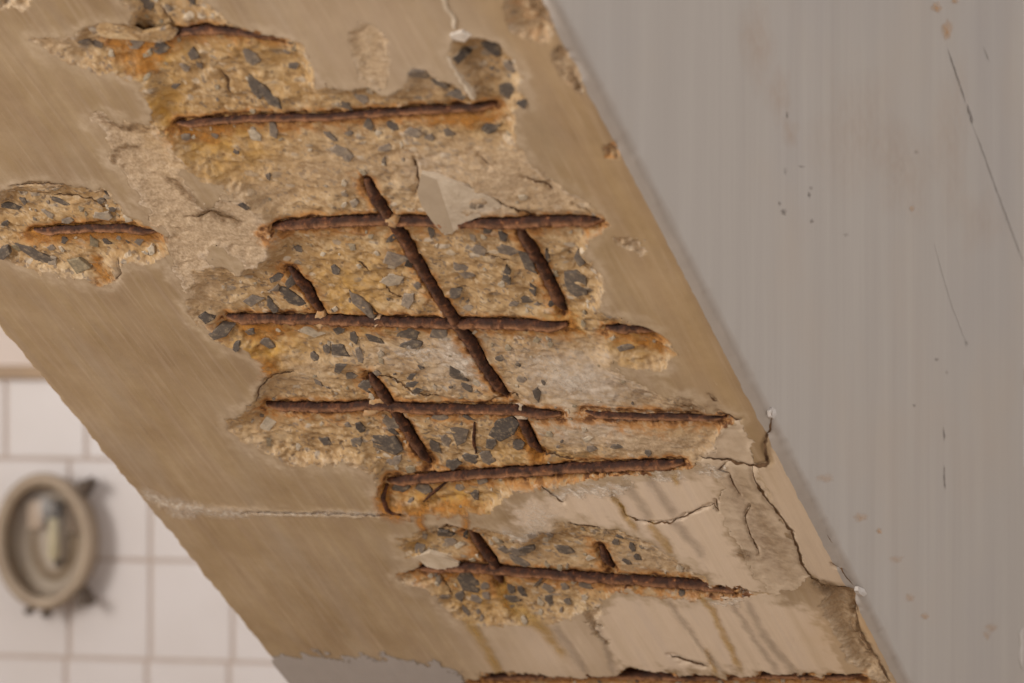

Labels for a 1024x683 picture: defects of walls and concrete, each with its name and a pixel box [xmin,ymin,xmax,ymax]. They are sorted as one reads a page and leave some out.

rust [30,222,154,241]
spalling [0,0,812,645]
crack [619,409,889,680]